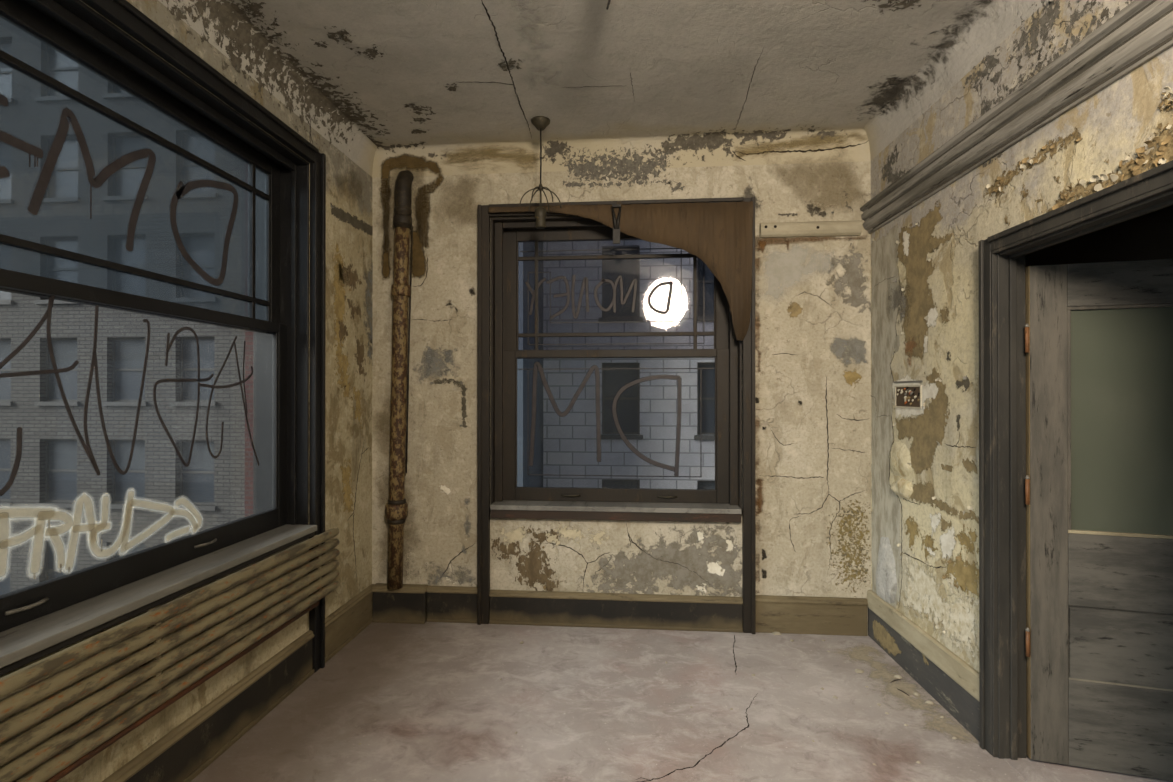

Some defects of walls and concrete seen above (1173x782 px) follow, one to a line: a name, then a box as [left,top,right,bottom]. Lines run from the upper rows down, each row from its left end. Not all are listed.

peeling [162,0,446,159]
crack [479,0,532,138]
peeling [963,0,1132,122]
peeling [542,126,842,195]
peeling [983,87,1173,213]
peeling [430,378,467,428]
crack [759,270,945,604]
peeling [827,200,979,666]
flaking render [491,522,742,597]
crack [545,528,719,593]
damp [826,495,871,597]
crack [636,693,758,782]